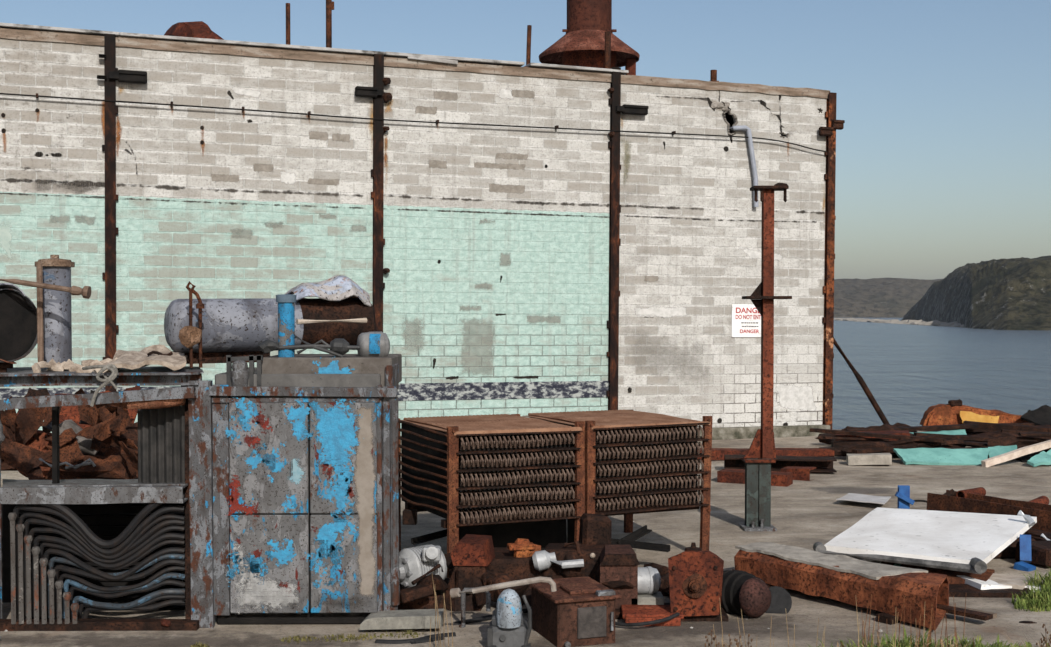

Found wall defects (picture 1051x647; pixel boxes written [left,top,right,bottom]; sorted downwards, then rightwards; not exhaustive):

rust [101,102,121,154]
crack [657,90,784,133]